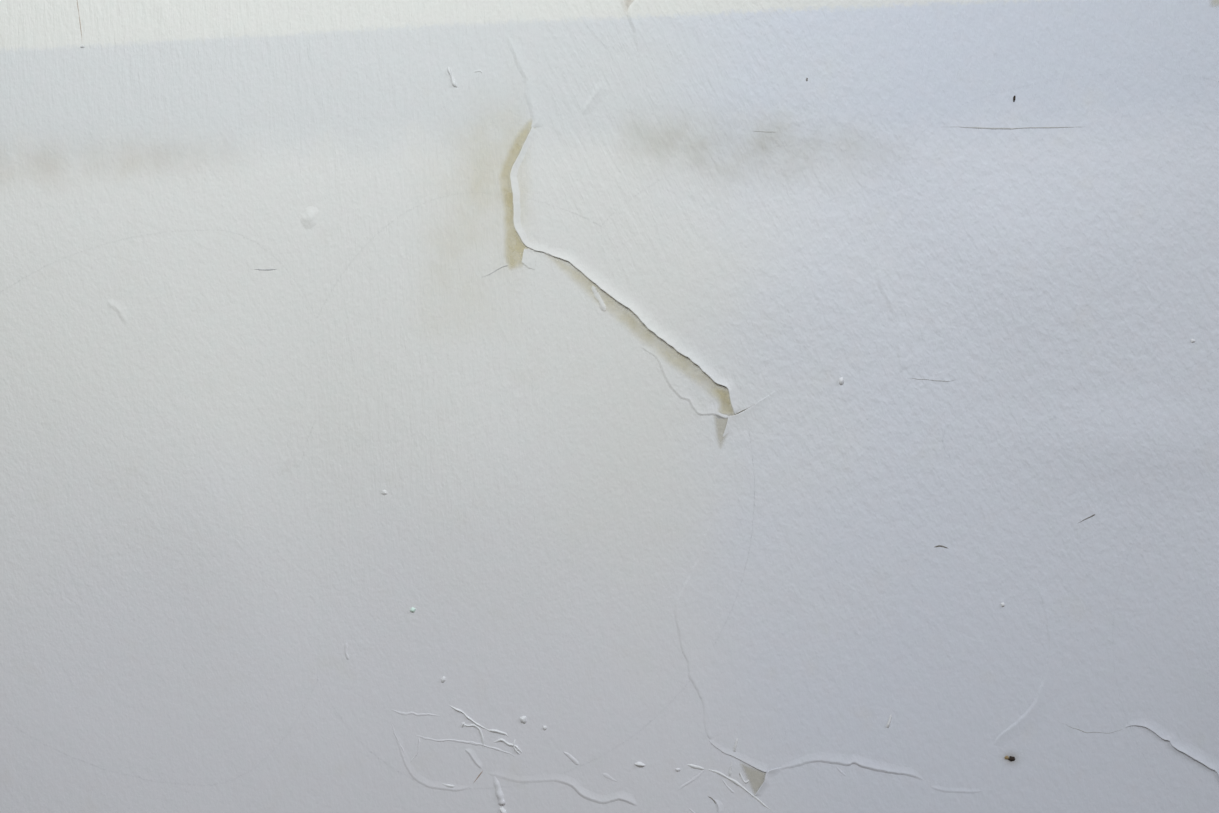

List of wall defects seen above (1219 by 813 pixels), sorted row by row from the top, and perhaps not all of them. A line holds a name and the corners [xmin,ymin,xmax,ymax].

crack [483,35,983,797]
crack [1063,718,1219,776]